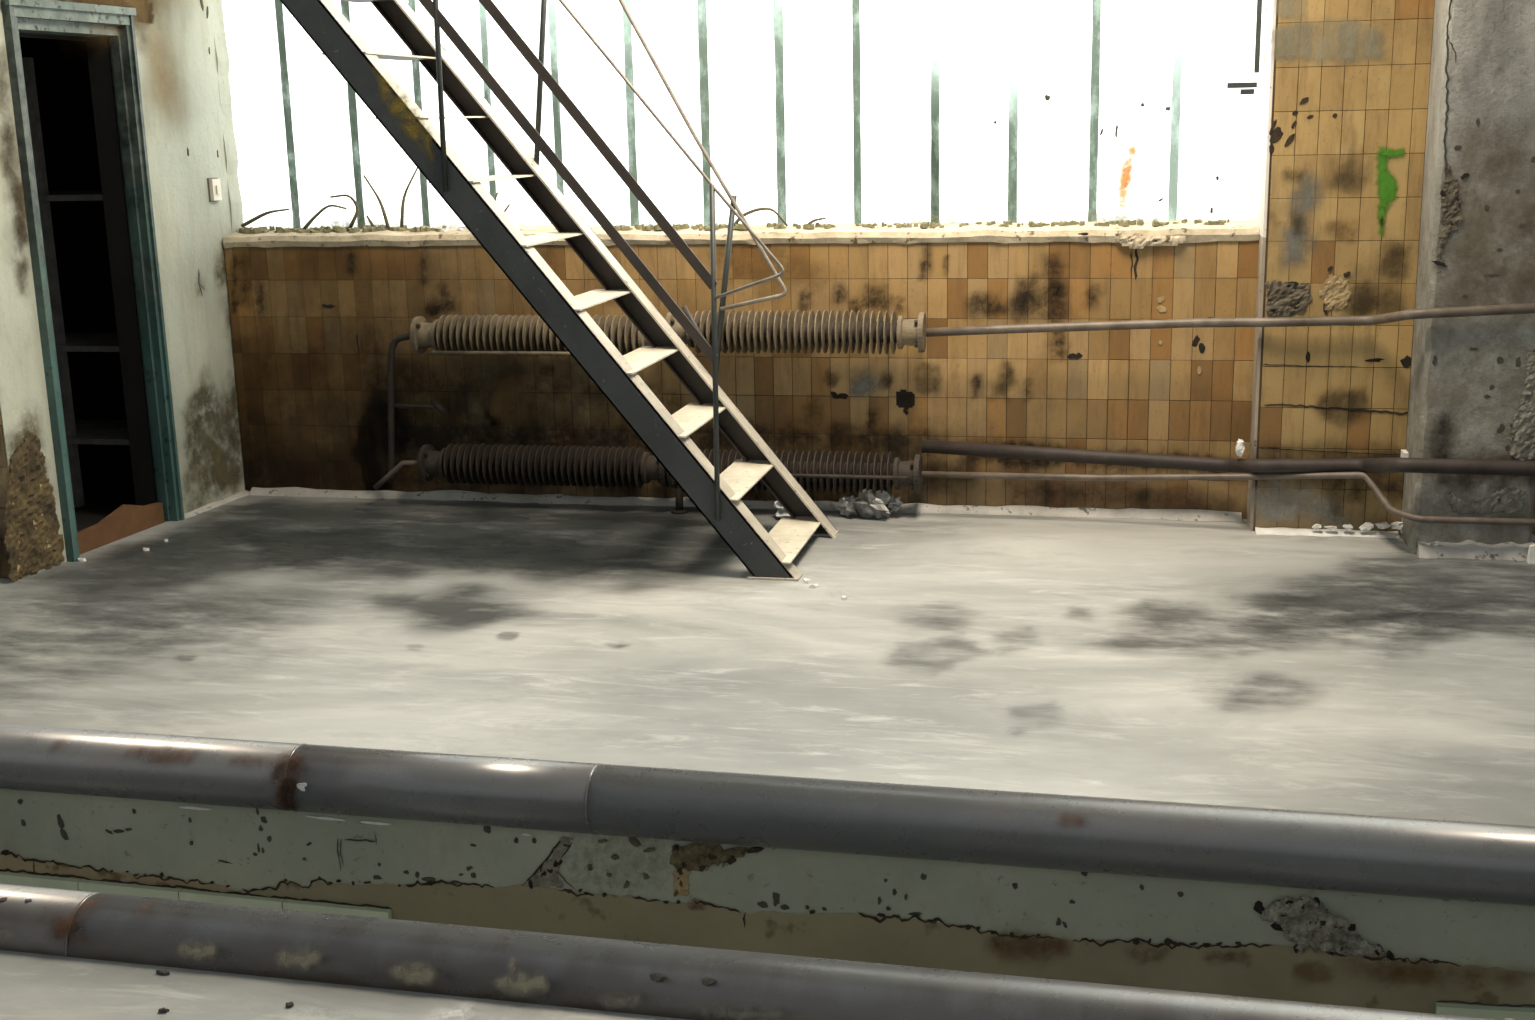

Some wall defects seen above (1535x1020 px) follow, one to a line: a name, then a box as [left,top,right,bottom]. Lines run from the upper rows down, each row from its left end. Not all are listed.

leakage [42,387,734,627]
leakage [1106,556,1535,647]
rust [276,758,298,811]
spalling [0,789,1535,1014]